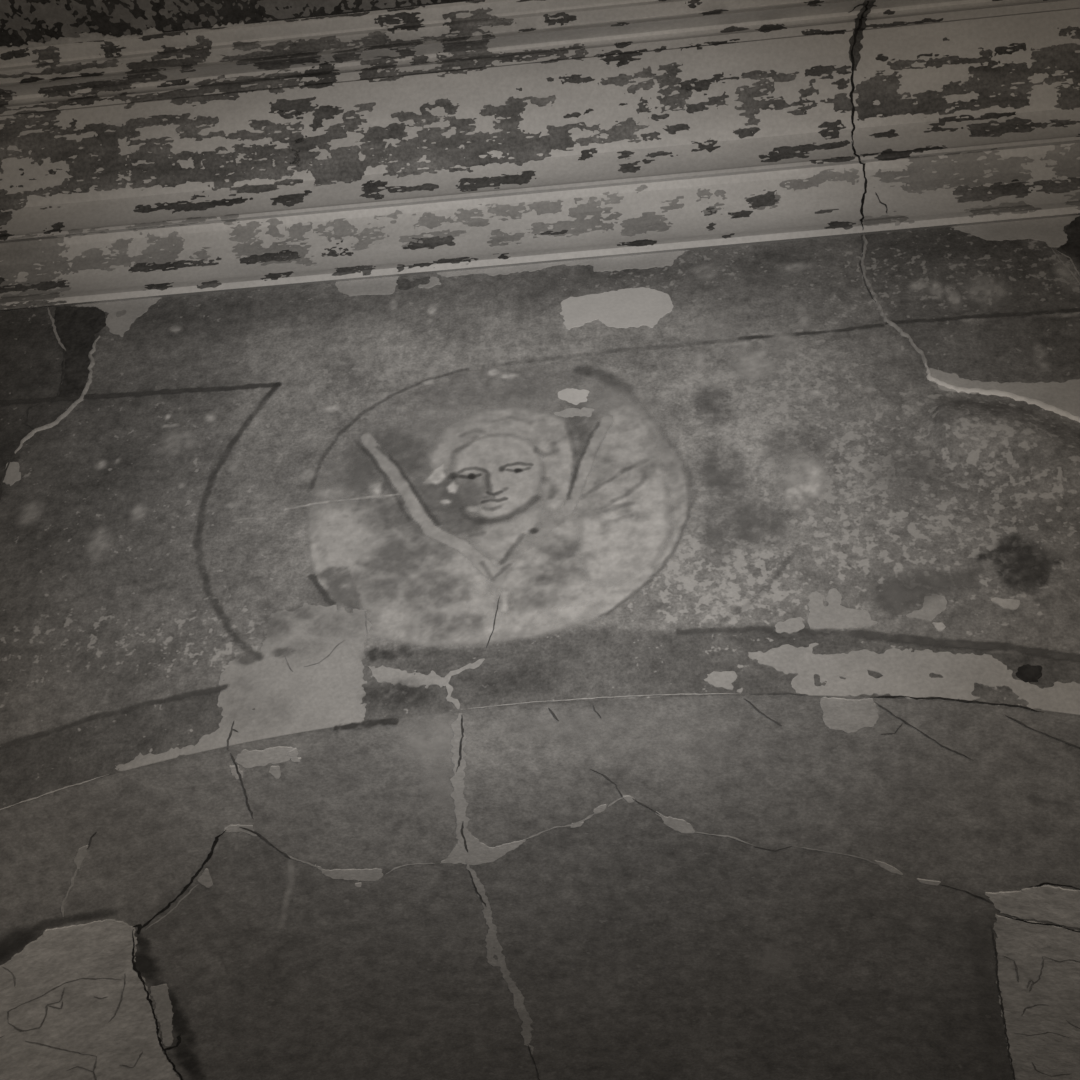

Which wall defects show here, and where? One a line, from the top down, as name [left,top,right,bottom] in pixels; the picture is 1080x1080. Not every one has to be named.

peeling [0,0,1080,397]
crack [848,0,1080,423]
flaking render [0,603,443,810]
flaking render [461,671,743,710]
flaking render [748,588,1080,734]
crack [870,696,1080,761]
flaking render [0,919,180,1080]
crack [0,721,318,1080]
crack [439,597,540,1080]
crack [943,885,1080,1080]
flaking render [985,885,1080,1080]
crack [1030,882,1080,890]